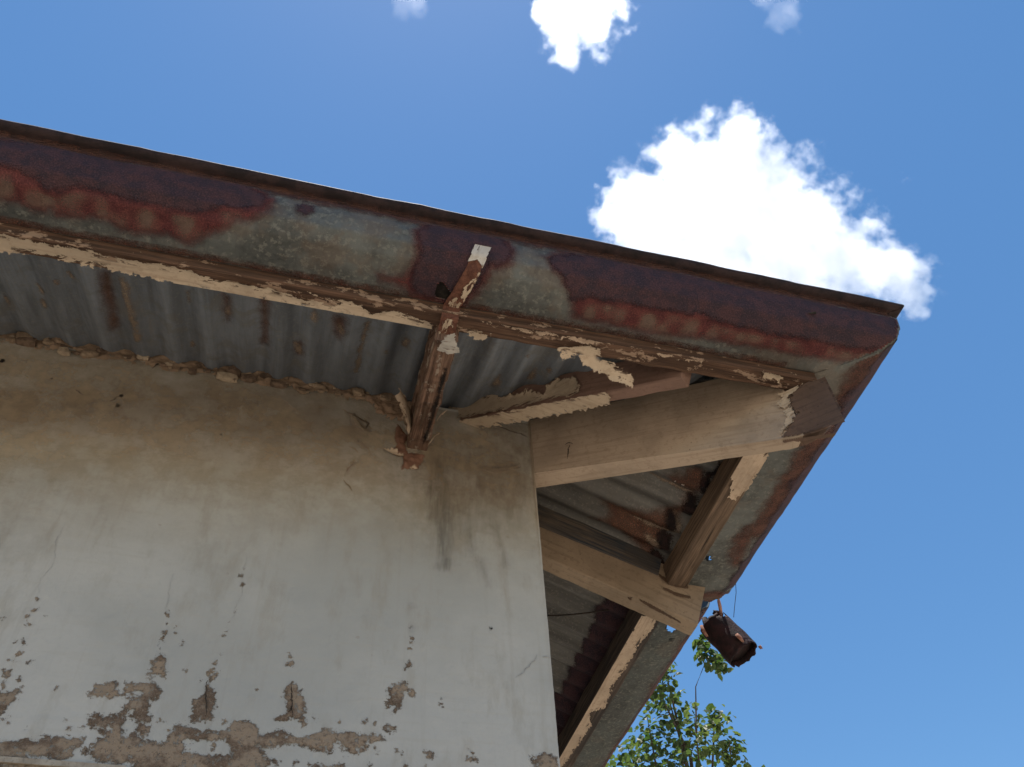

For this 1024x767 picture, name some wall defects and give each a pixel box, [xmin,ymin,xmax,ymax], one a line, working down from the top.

spalling [0,332,611,470]
peeling [0,233,634,388]
corrosion [0,131,899,624]
flaking render [0,597,417,767]
corrosion [554,598,629,739]
peeling [529,597,681,767]